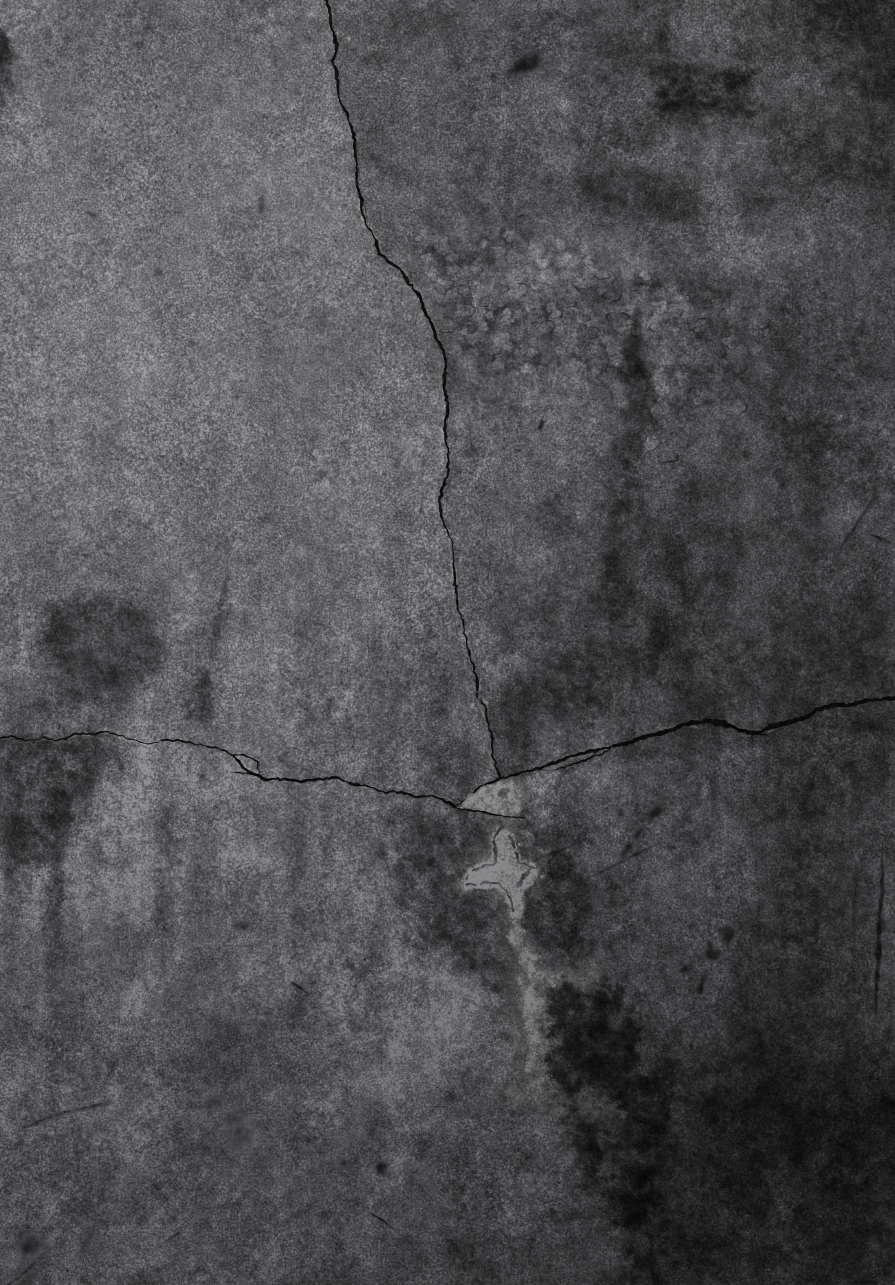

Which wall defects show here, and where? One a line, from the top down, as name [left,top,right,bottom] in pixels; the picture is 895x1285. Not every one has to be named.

water stain [641,0,765,126]
crack [0,0,895,818]
water stain [365,629,895,1285]